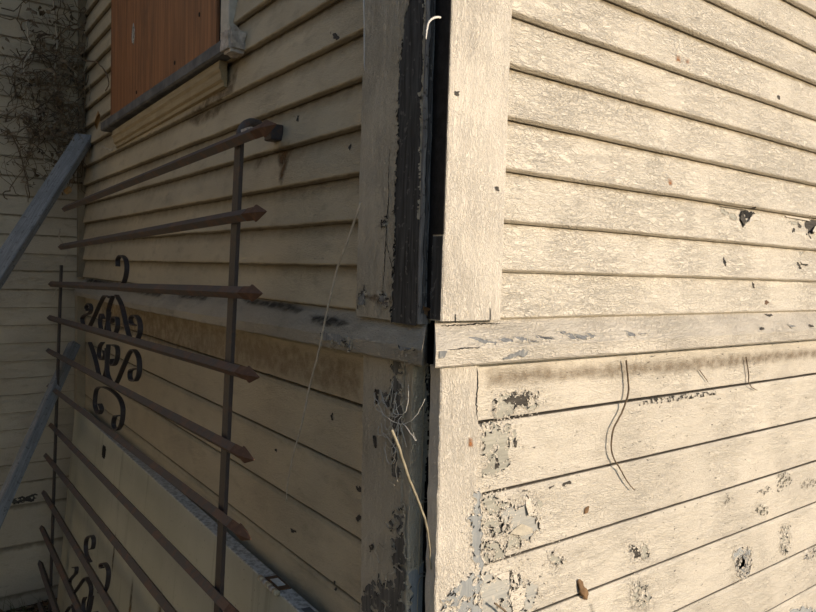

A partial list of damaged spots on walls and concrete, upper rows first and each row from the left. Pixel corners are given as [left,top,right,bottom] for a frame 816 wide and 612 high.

peeling [355,0,436,326]
peeling [792,216,816,239]
peeling [464,329,597,360]
peeling [372,361,430,483]
peeling [439,368,569,612]
peeling [357,501,424,612]
peeling [625,535,655,612]
peeling [731,539,755,586]
peeling [776,520,796,556]
peeling [790,596,816,612]